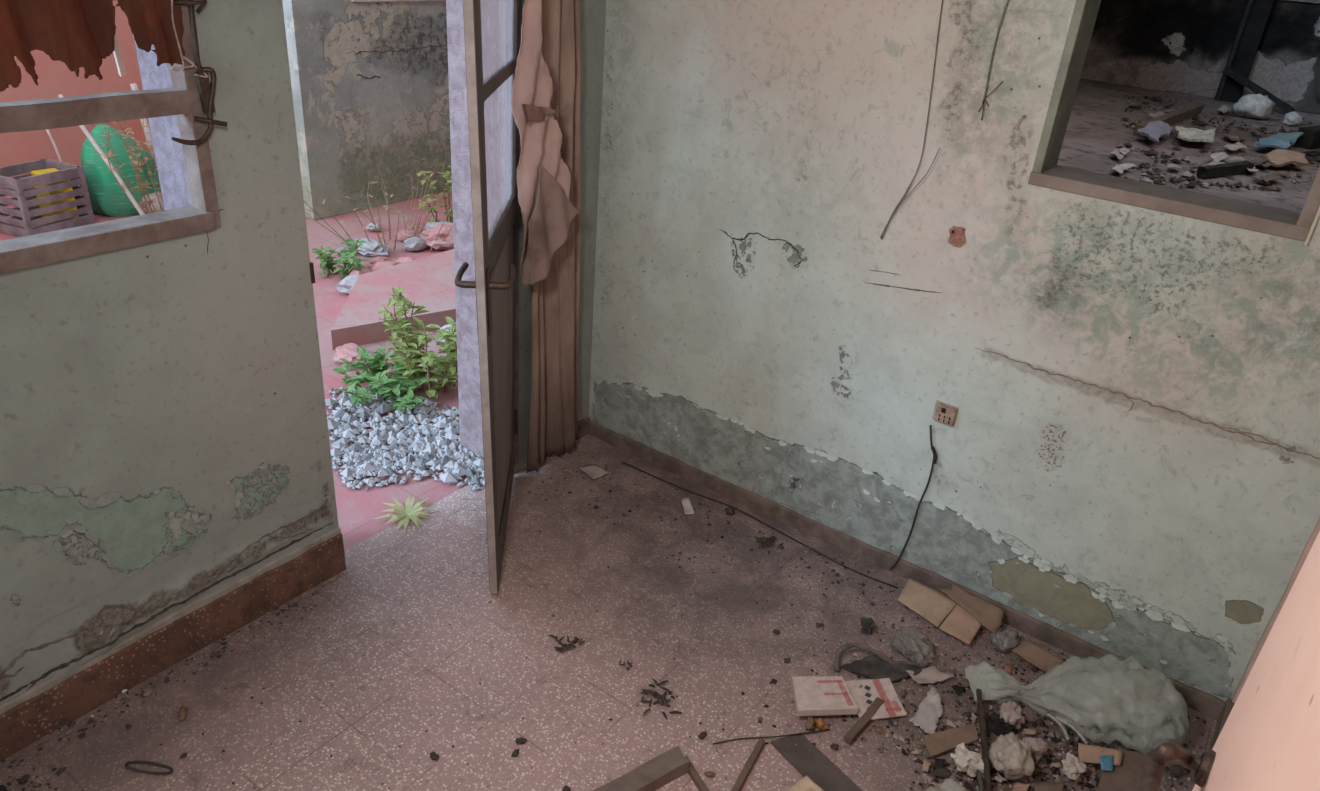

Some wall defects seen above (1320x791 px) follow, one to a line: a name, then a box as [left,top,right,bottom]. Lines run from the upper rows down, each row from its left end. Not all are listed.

peeling [730,235,757,279]
peeling [782,243,808,269]
leakage [1056,209,1279,310]
crack [975,348,1320,459]
peeling [225,462,291,522]
spalling [163,506,212,554]
spalling [593,379,1240,698]
spalling [1225,600,1264,624]
spalling [685,756,710,791]
spalling [731,738,765,791]